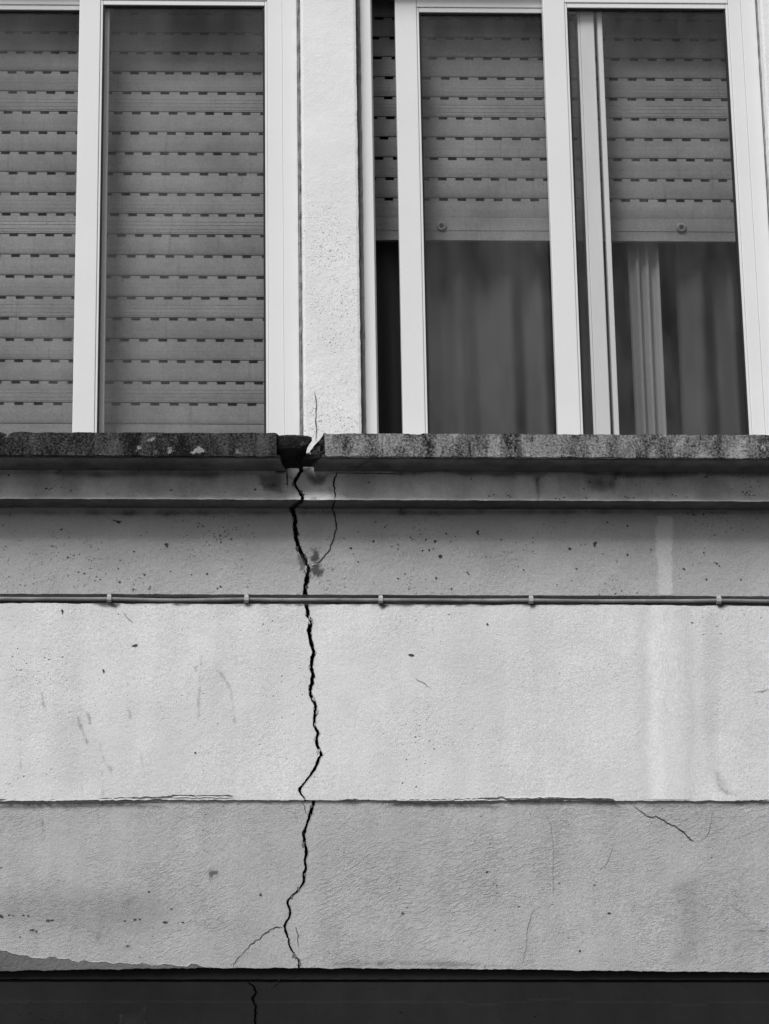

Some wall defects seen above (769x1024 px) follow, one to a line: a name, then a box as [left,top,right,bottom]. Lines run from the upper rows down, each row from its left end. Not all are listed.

crack [233,461,395,1024]
crack [636,807,713,841]
peeling [0,949,209,971]